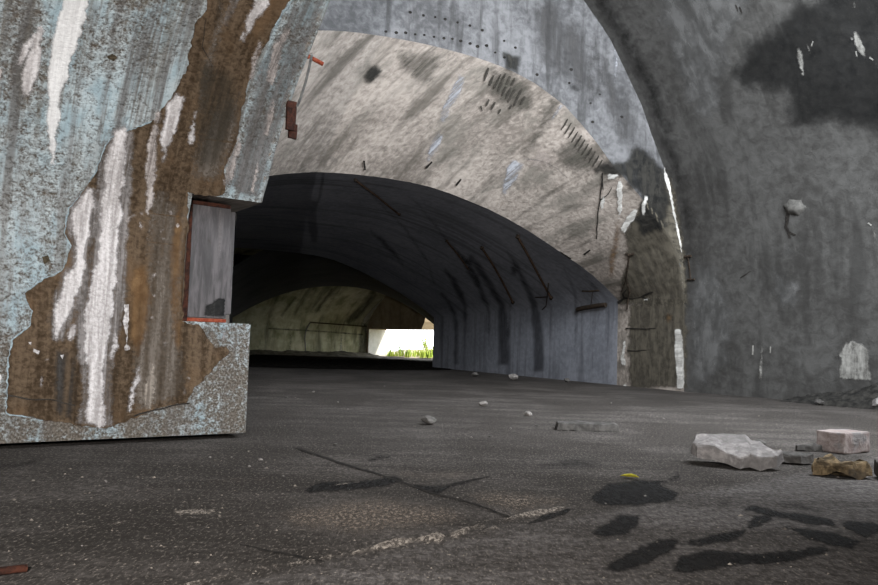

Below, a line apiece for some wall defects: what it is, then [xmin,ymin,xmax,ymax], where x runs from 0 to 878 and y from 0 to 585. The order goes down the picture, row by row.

damp [19,0,88,164]
damp [537,6,633,139]
damp [851,32,874,61]
peeling [5,0,293,428]
damp [561,141,688,389]